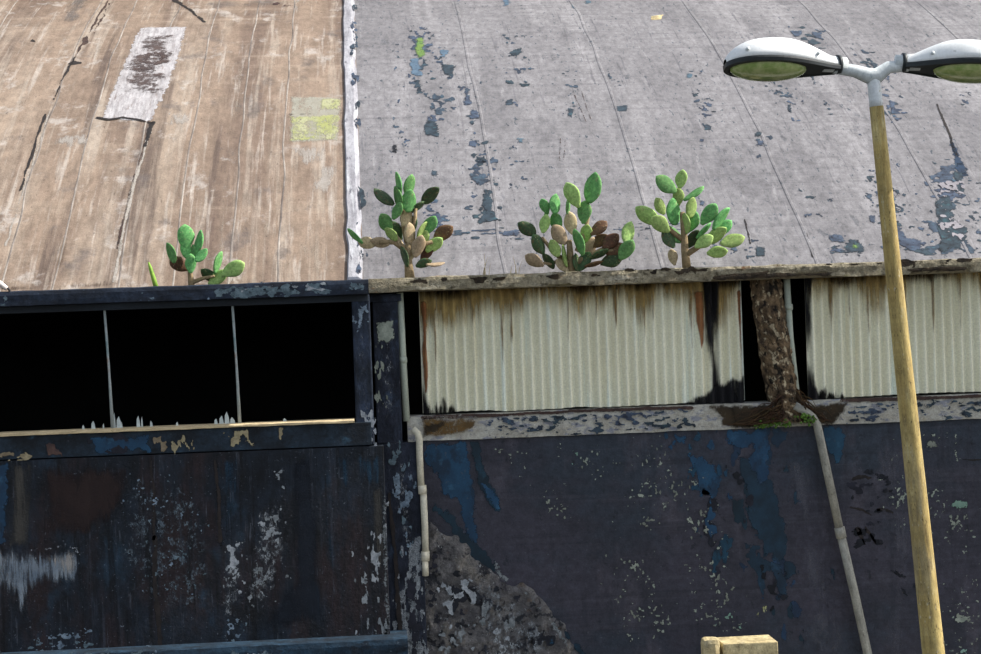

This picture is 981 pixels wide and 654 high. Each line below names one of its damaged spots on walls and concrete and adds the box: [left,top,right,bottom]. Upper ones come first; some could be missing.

crack [172,0,206,22]
crack [5,0,110,246]
crack [112,132,152,282]
peeling [392,25,529,240]
peeling [893,159,981,272]
crack [936,104,969,176]
corrosion [419,282,704,393]
corrosion [718,281,742,350]
water stain [0,466,80,608]
peeling [223,506,291,654]
spalling [350,304,585,654]
peeling [487,408,802,642]